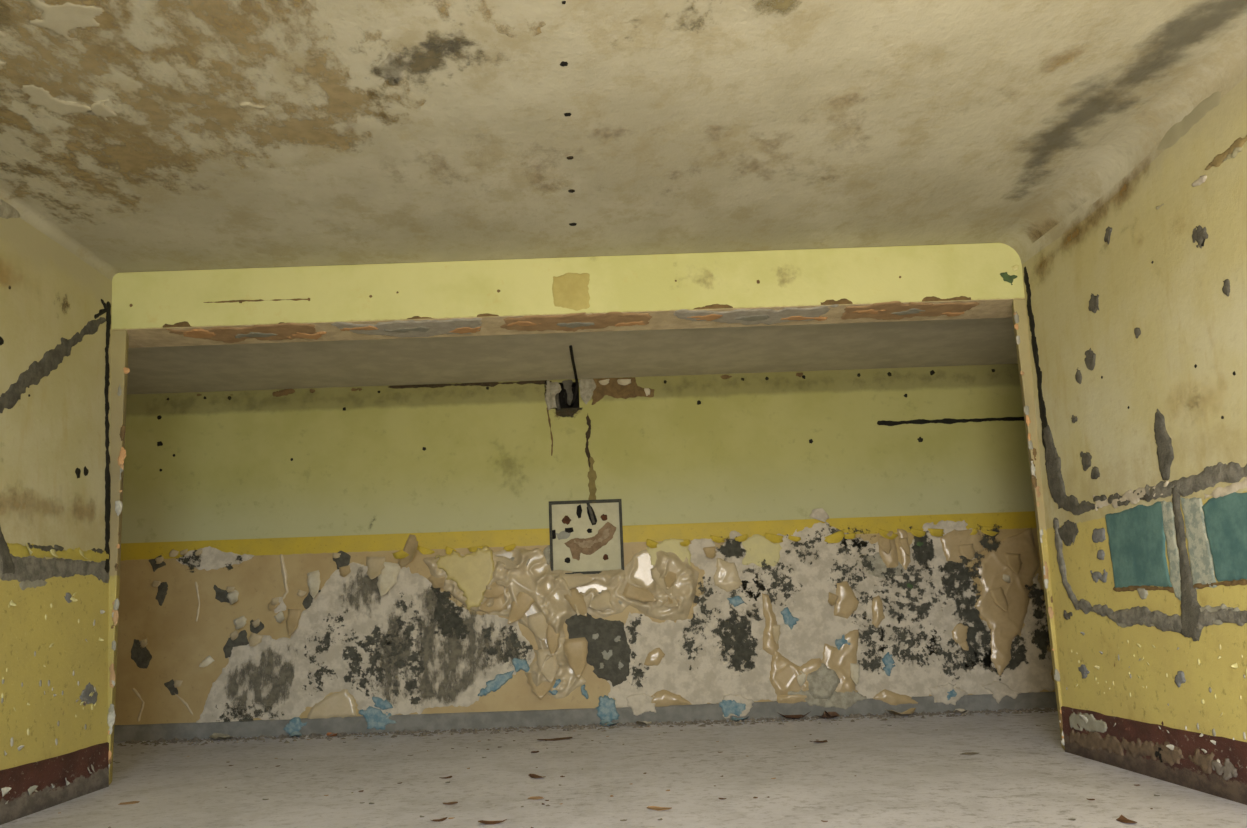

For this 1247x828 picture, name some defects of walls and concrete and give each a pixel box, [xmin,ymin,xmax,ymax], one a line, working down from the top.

water stain [0,0,484,222]
spalling [115,425,126,516]
crack [272,389,315,397]
crack [351,380,553,456]
crack [585,414,597,500]
peeling [545,377,654,410]
spalling [1024,406,1041,507]
spalling [34,598,119,735]
peeling [174,535,535,735]
peeling [607,480,1247,718]
flaking render [1059,710,1247,780]